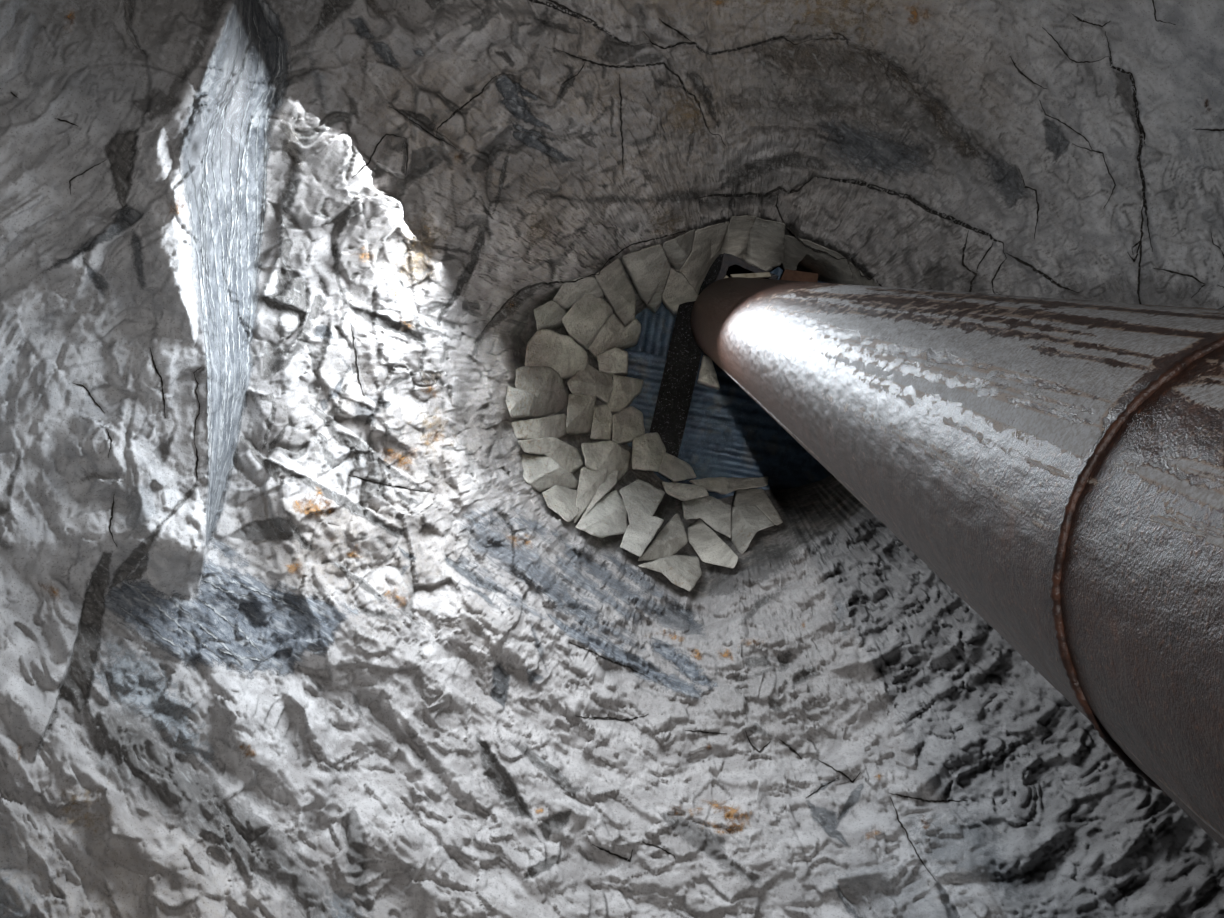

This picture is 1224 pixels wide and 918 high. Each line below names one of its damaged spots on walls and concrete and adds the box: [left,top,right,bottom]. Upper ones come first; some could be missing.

crack [1152,0,1176,25]
crack [352,74,501,178]
crack [529,0,851,170]
crack [1010,13,1224,309]
rust [675,802,749,833]